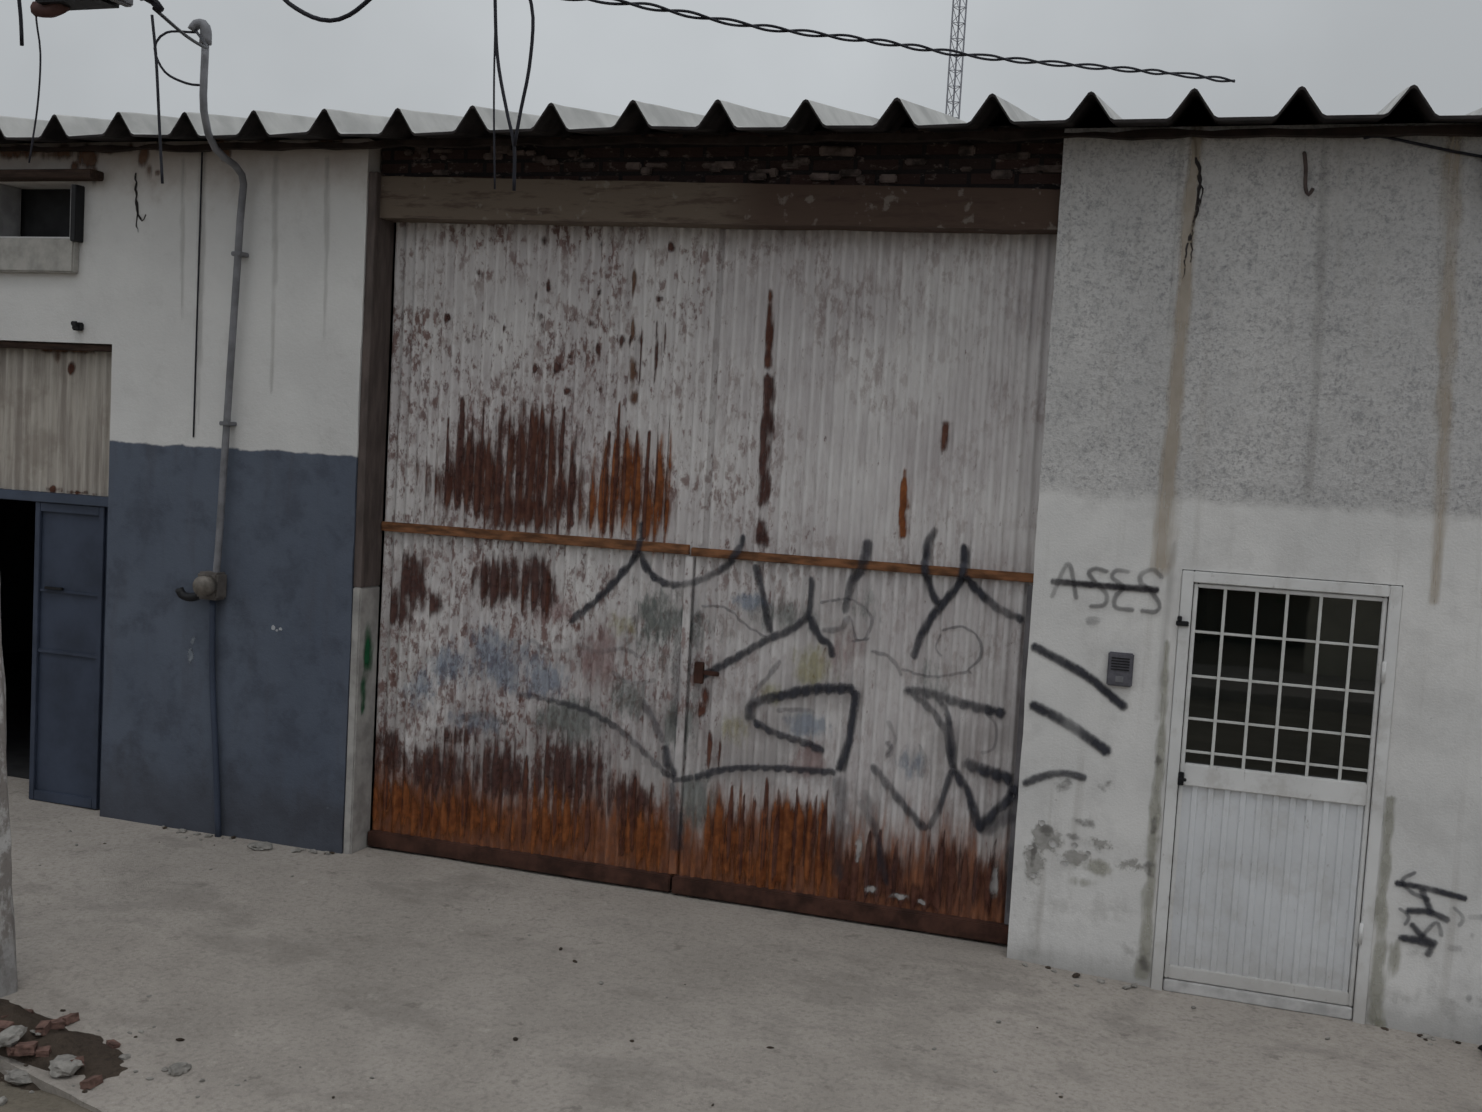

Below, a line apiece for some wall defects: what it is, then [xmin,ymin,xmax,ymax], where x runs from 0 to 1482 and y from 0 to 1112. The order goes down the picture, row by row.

crack [1182,137,1204,279]
rust [416,319,672,557]
rust [756,290,776,547]
rust [899,470,909,538]
rust [941,422,949,452]
rust [390,552,443,627]
rust [471,552,556,617]
rust [373,727,670,871]
rust [692,778,1003,914]
peeling [1024,820,1110,880]